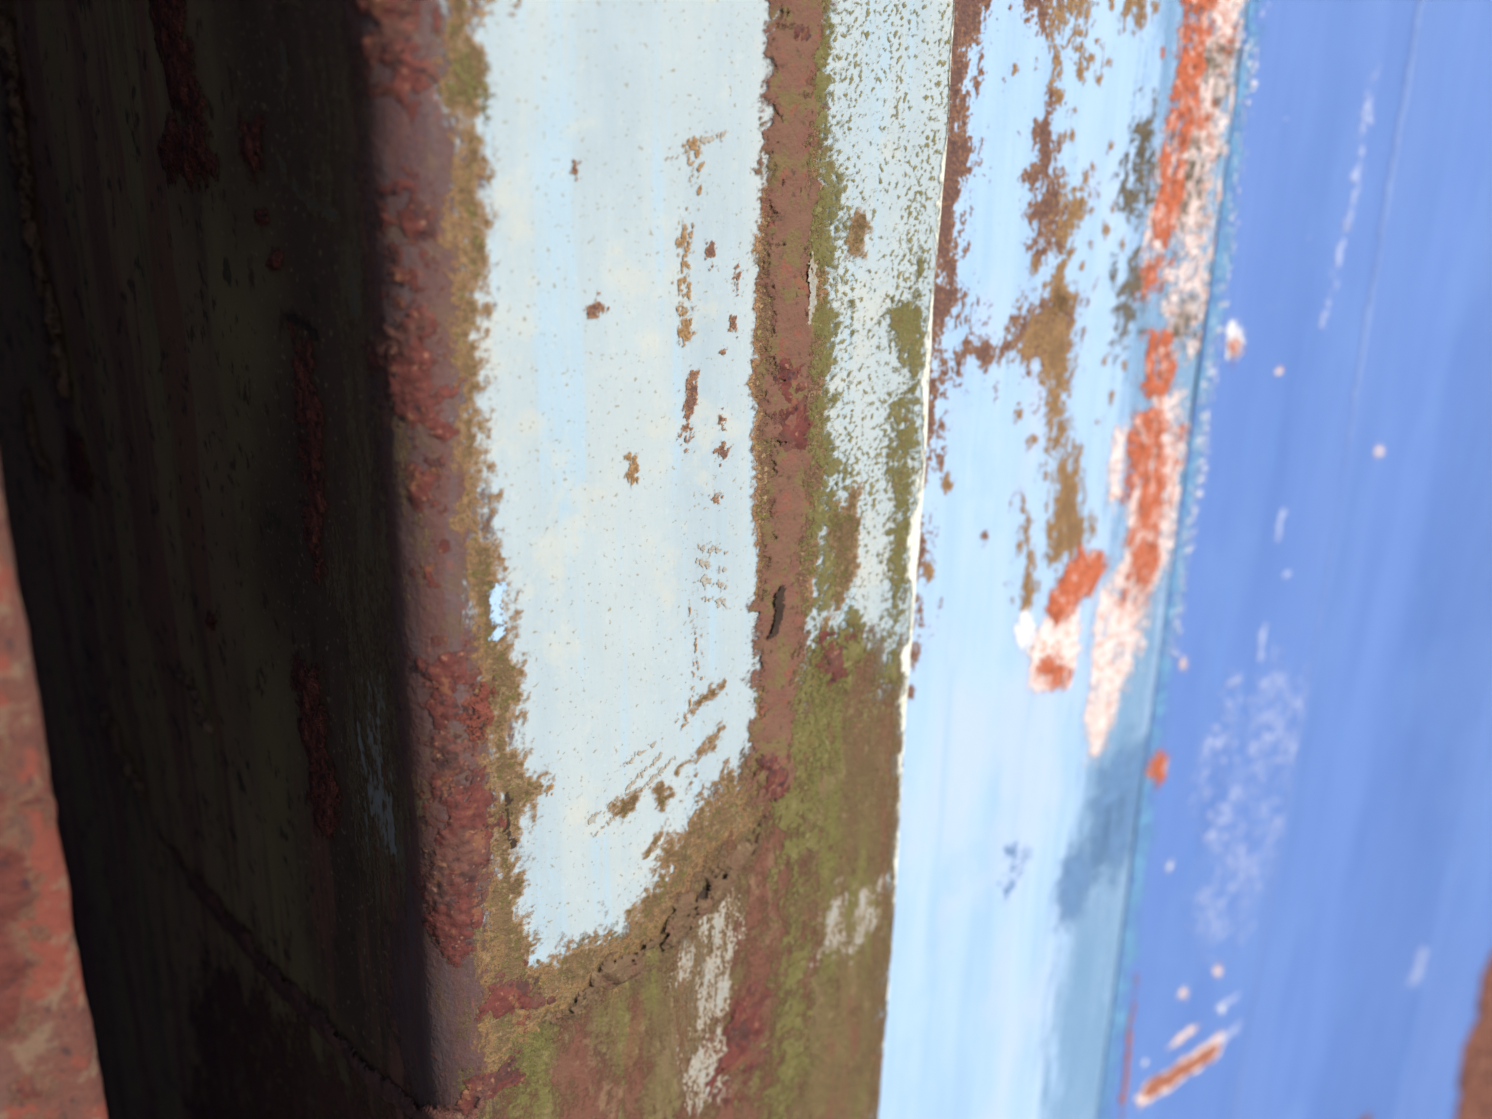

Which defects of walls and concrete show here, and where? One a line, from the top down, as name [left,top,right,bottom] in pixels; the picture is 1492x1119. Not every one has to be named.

peeling [935,5,955,255]
corrosion [170,0,1160,1119]
peeling [893,291,934,917]
peeling [1012,0,1248,935]
peeling [998,836,1032,904]
corrosion [1141,1043,1221,1100]
corrosion [1453,955,1492,1119]